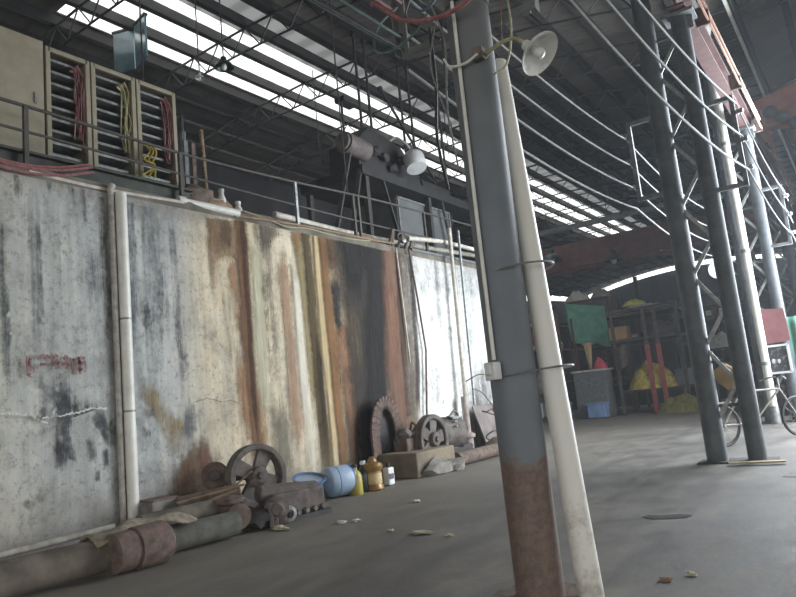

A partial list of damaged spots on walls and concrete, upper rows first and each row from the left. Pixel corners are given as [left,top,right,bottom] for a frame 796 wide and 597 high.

leakage [0,228,10,373]
crack [0,407,107,424]
leakage [92,218,111,328]
rust [208,218,268,455]
rust [280,231,356,467]
leakage [329,240,390,470]